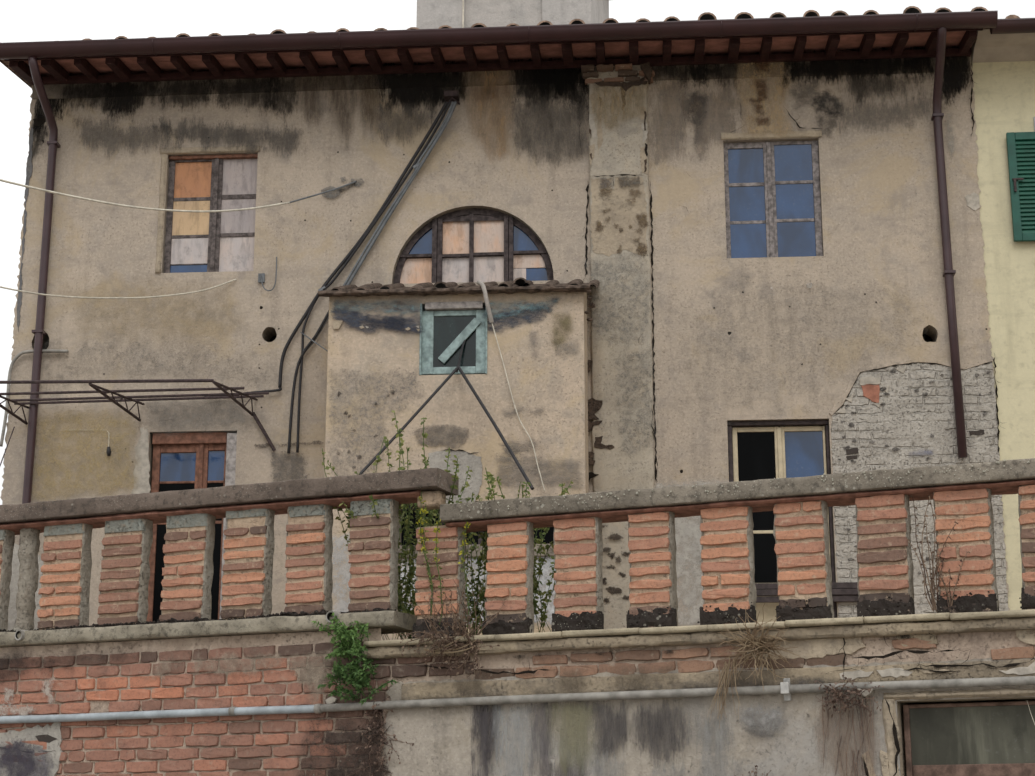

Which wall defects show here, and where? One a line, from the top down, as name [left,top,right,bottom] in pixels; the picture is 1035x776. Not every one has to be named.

leakage [32,76,349,157]
leakage [362,59,643,162]
leakage [656,47,971,133]
peeling [589,62,653,340]
leakage [333,301,422,333]
crack [584,174,658,485]
peeling [829,356,1000,474]
peeling [834,505,858,582]
peeling [909,500,939,614]
peeling [740,637,866,660]
leakage [471,702,689,776]
crack [885,699,900,776]